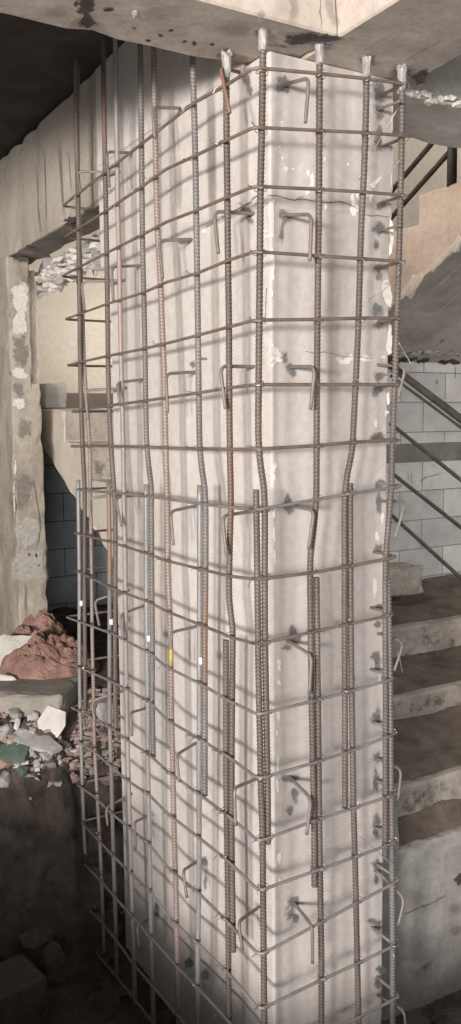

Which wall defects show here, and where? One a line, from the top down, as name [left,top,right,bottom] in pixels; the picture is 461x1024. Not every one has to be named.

spalling [8,0,137,1006]
crack [205,195,388,228]
spalling [336,56,461,1024]